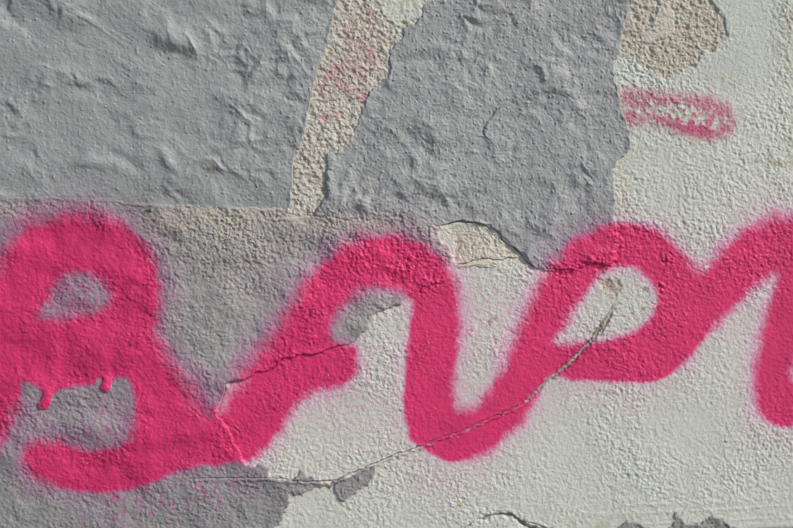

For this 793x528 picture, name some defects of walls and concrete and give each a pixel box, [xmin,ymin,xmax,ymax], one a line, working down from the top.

peeling [618,0,730,80]
peeling [287,0,434,217]
peeling [441,224,533,271]
crack [376,219,620,311]
spalling [598,277,624,302]
crack [181,299,619,487]
peeling [319,467,375,502]
crack [464,510,547,528]
peeling [618,520,651,528]
peeling [668,511,737,528]